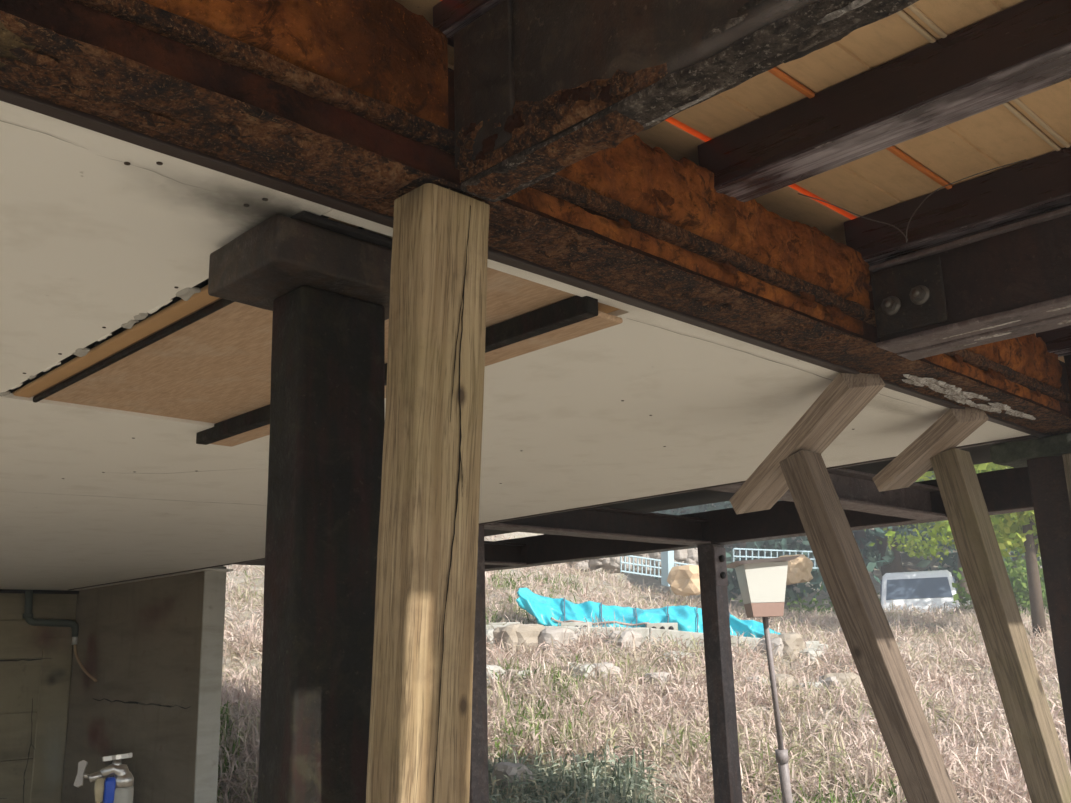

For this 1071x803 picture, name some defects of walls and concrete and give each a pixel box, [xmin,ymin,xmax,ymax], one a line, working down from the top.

rust [142,0,448,129]